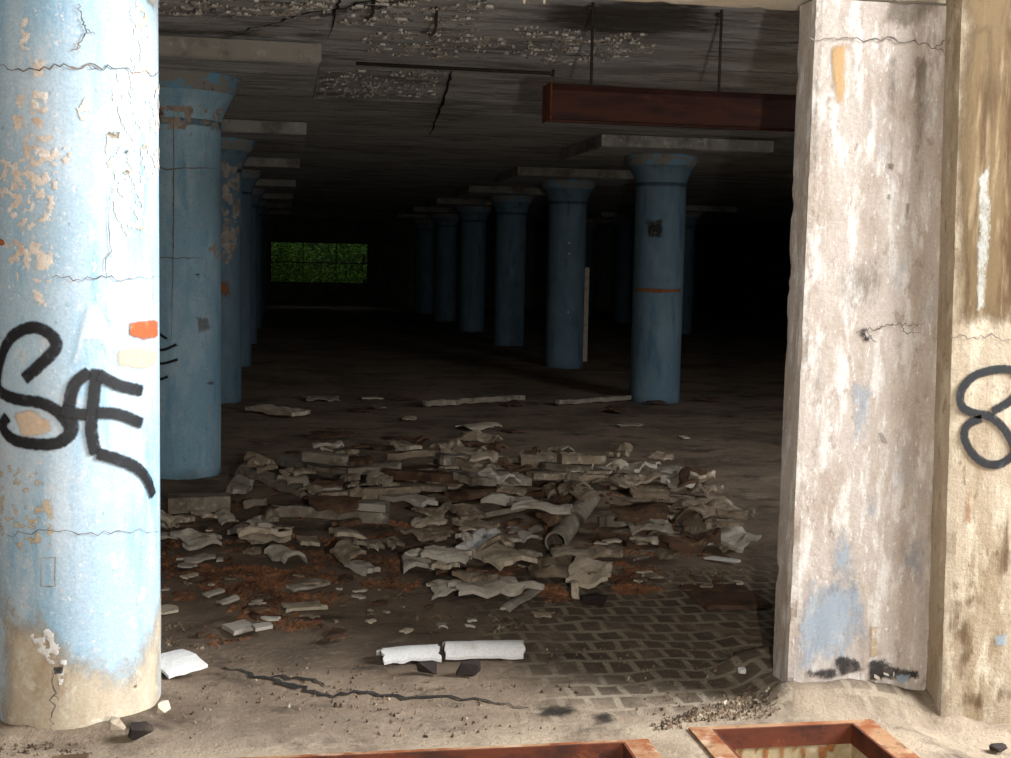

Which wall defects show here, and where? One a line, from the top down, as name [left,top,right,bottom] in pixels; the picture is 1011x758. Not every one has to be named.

peeling [20,17,45,77]
crack [0,4,158,76]
crack [236,0,386,37]
water stain [158,0,710,65]
crack [811,36,946,56]
peeling [105,0,223,238]
water stain [316,70,444,99]
water stain [961,0,1011,322]
peeling [0,90,71,307]
peeling [205,161,242,264]
peeling [2,608,161,730]
crack [222,667,528,708]